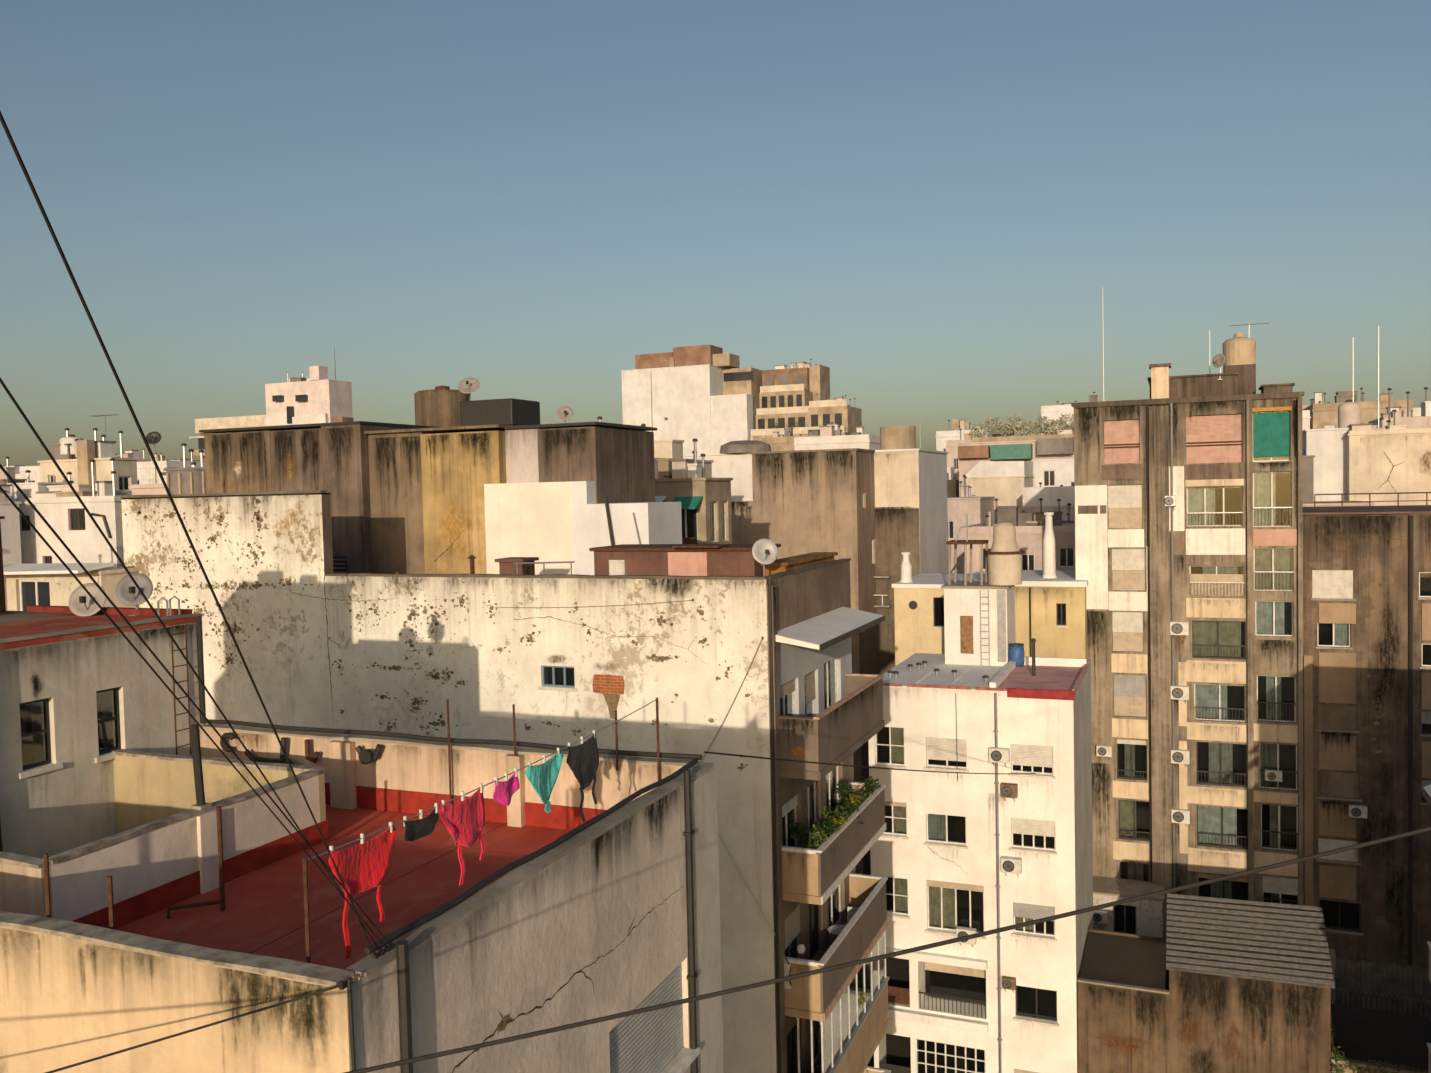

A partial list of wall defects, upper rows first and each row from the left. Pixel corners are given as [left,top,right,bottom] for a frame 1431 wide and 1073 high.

leakage [212,427,350,469]
leakage [376,433,486,474]
peeling [125,499,313,676]
peeling [330,578,509,736]
peeling [493,625,542,654]
peeling [626,611,687,662]
leakage [1376,603,1401,706]
spalling [592,674,625,719]
leakage [1359,805,1394,856]
crack [452,886,683,1073]
leakage [1180,972,1322,1040]